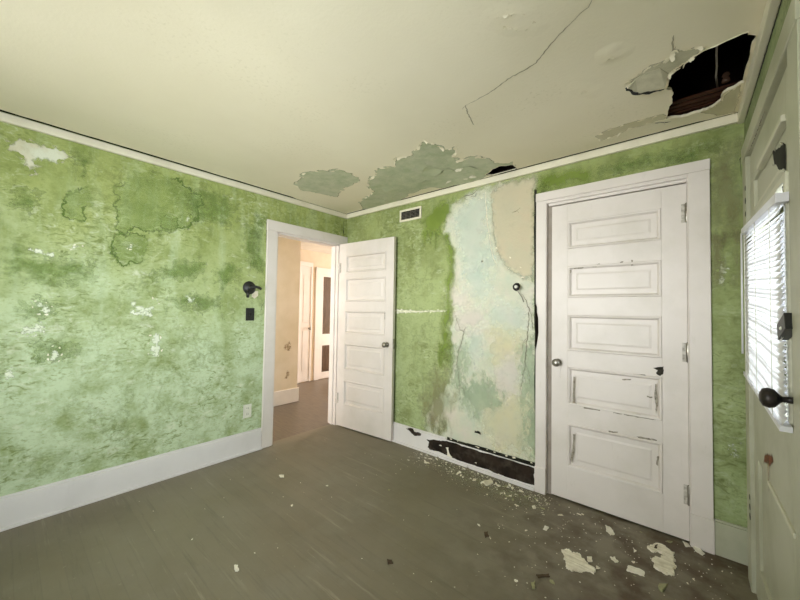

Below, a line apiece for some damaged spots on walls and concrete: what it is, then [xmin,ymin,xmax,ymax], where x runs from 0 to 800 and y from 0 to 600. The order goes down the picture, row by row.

crack [463,1,592,125]
water stain [61,187,87,222]
water stain [110,177,229,267]
peeling [0,31,756,510]
crack [452,315,465,396]
crack [520,295,533,389]